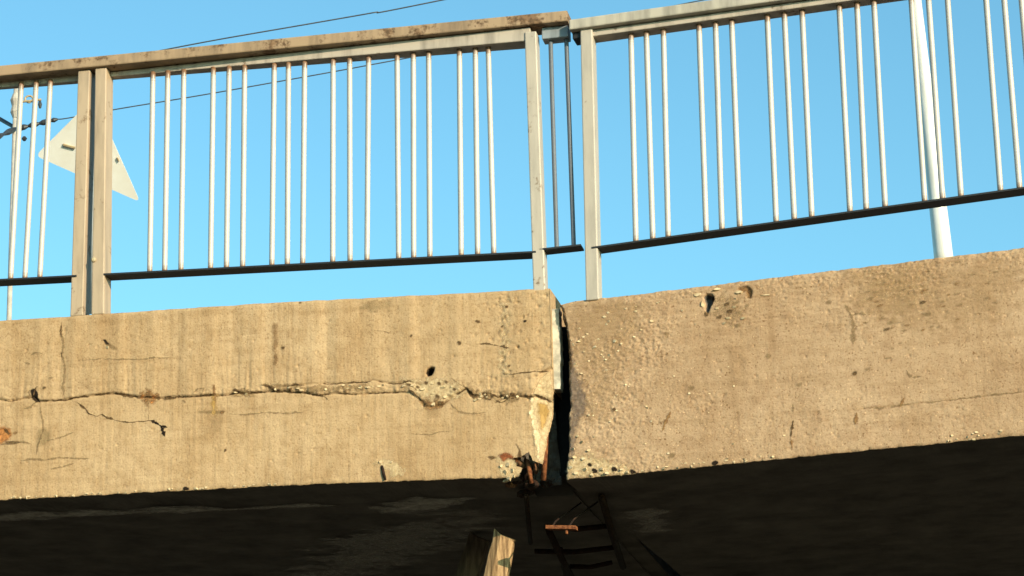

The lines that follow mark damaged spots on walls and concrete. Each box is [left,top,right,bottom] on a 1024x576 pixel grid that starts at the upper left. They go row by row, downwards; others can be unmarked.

spalling [693,286,770,326]
crack [1,324,549,469]
spalling [263,383,384,394]
rust [0,427,19,444]
spalling [401,371,626,576]